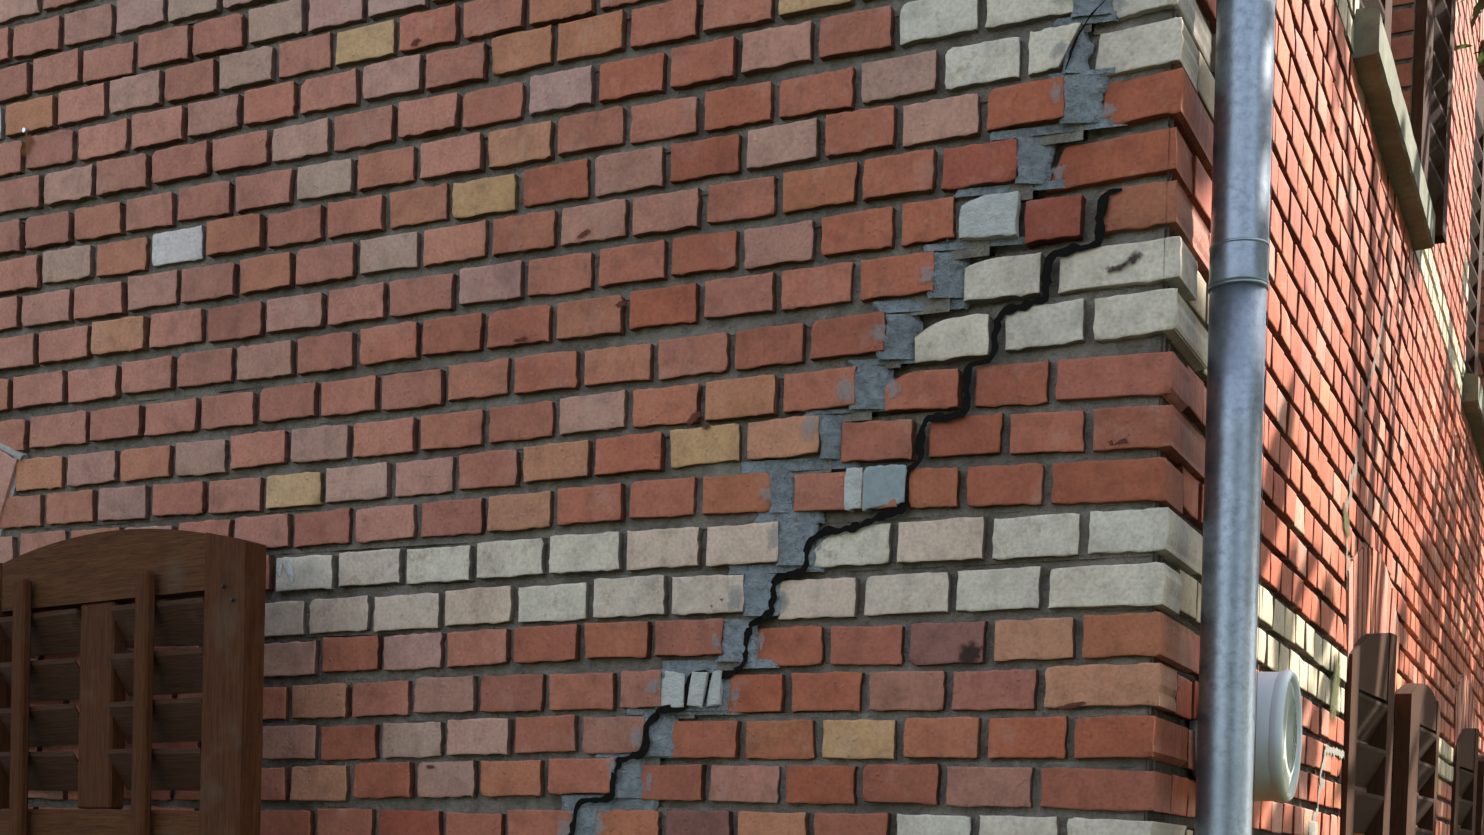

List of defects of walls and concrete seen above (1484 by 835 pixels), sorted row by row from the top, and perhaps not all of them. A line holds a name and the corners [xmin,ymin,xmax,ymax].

crack [560,0,1128,835]